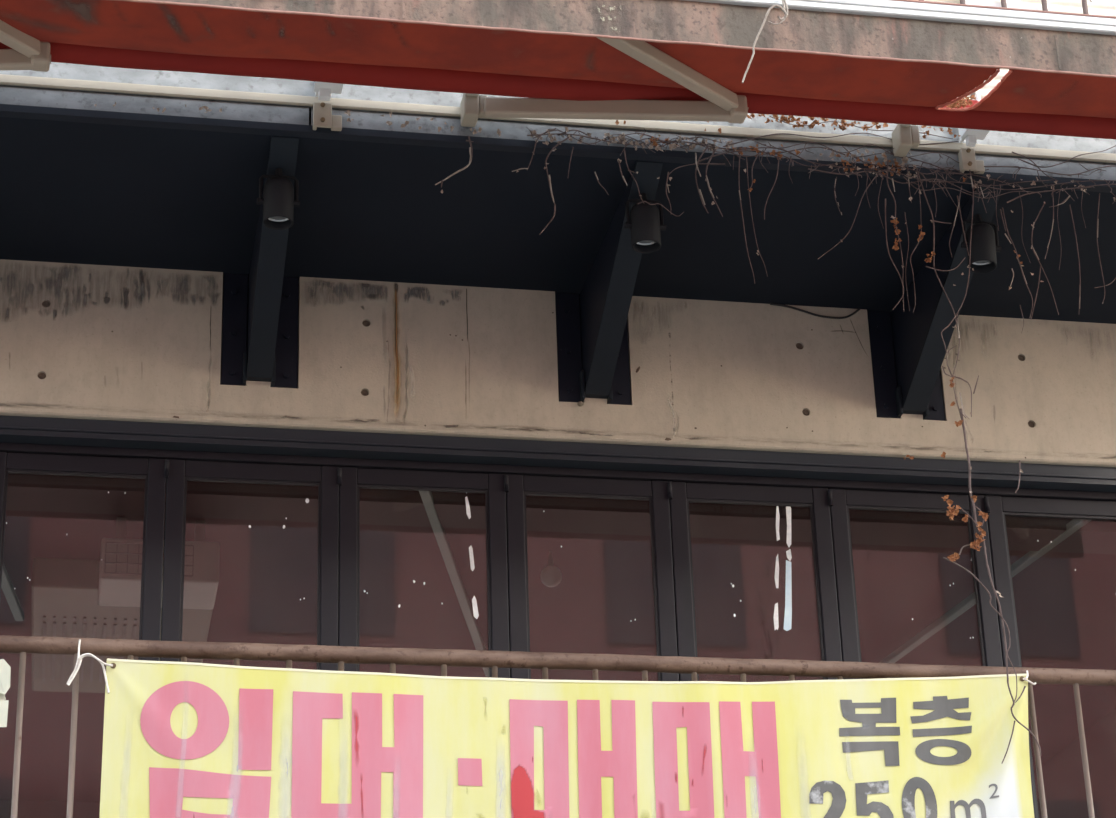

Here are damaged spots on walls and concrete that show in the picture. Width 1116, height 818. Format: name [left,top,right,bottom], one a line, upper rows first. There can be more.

leakage [6,267,161,318]